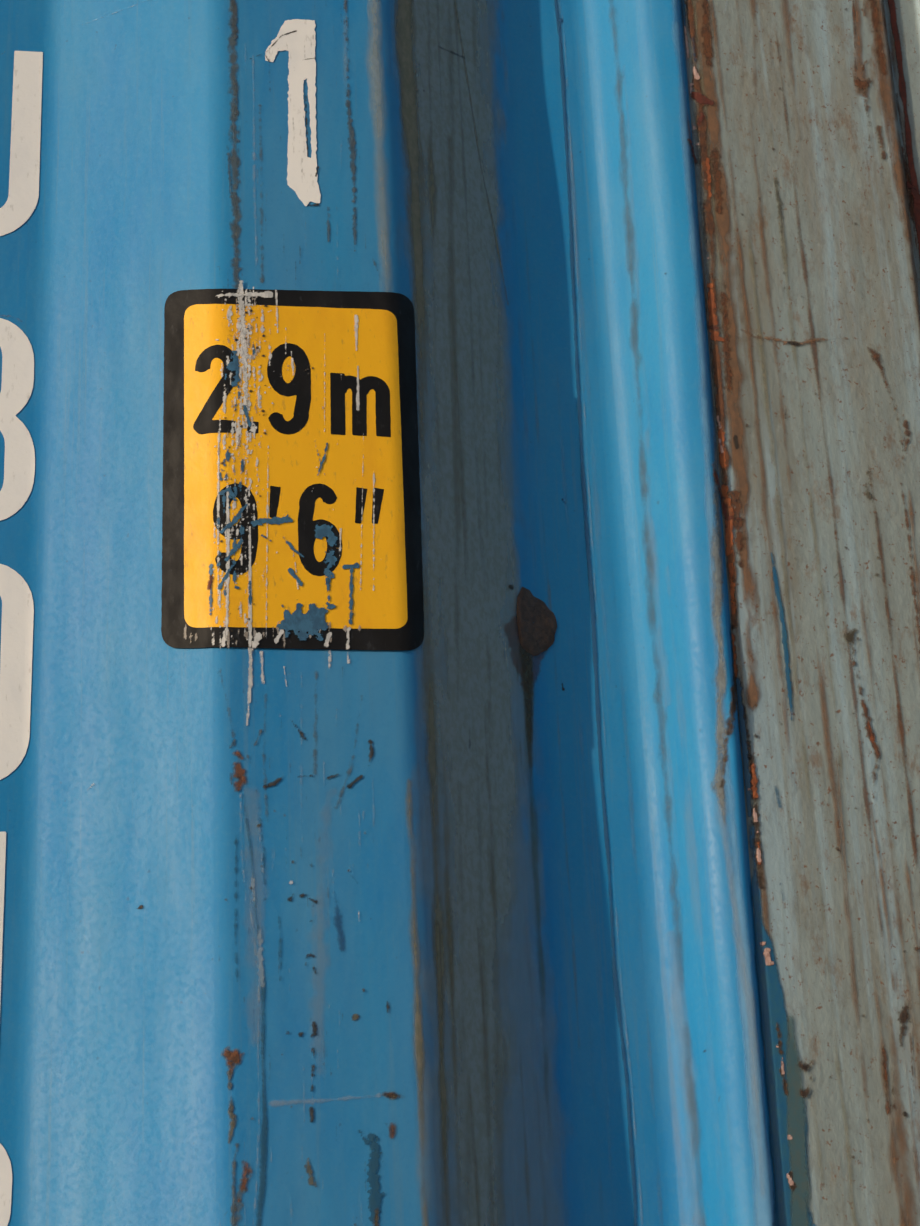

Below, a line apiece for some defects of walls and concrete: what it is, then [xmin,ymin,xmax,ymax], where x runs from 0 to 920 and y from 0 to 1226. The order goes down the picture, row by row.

rust [846,0,920,321]
peeling [184,280,375,657]
rust [682,0,782,965]
rust [809,308,819,395]
rust [865,471,890,634]
rust [867,347,911,459]
rust [901,483,920,653]
rust [820,629,881,869]
rust [893,667,917,891]
rust [898,1005,913,1075]
rust [223,1049,252,1226]
rust [881,1046,917,1226]